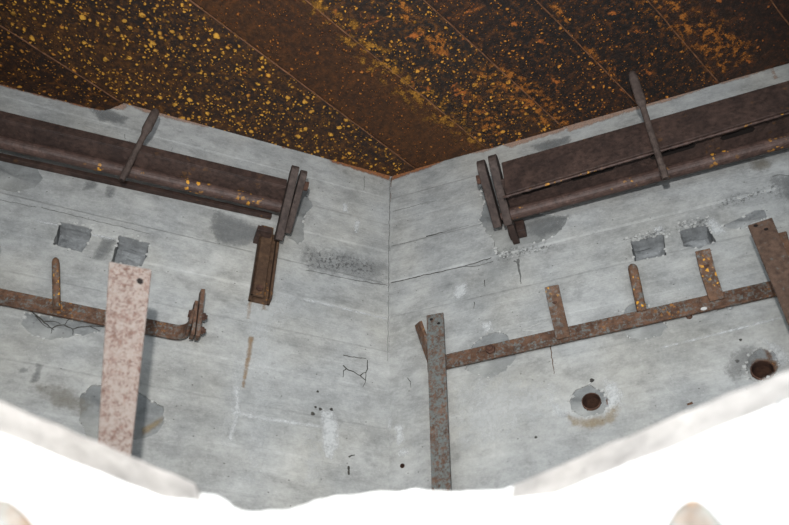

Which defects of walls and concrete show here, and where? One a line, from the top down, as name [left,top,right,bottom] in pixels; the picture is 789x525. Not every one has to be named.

corrosion [649,0,758,83]
corrosion [342,18,703,153]
water stain [213,217,256,243]
spalling [625,208,768,258]
crack [30,311,103,333]
spalling [471,331,509,349]
crack [343,355,368,386]
spalling [465,354,516,379]
spalling [735,346,781,382]
spalling [567,378,611,420]